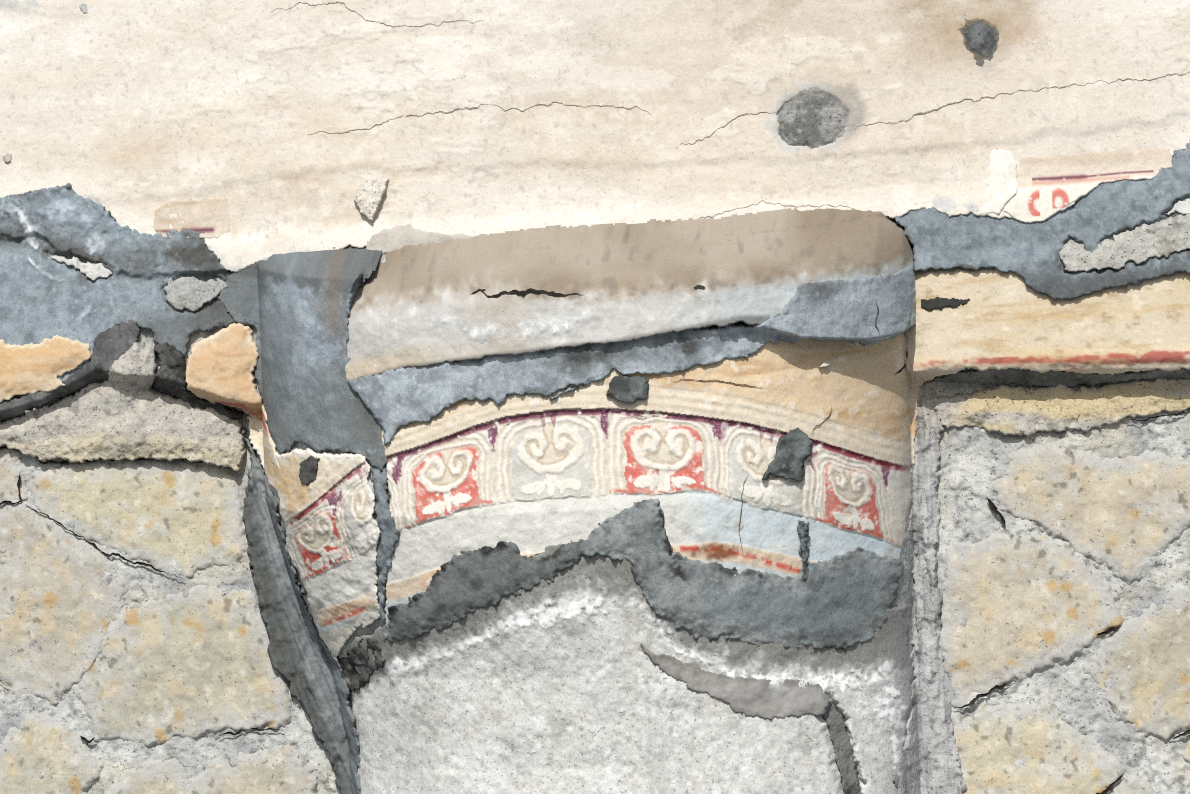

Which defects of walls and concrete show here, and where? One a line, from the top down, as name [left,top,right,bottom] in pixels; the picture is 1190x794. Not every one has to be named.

crack [313,102,649,134]
crack [856,71,1190,128]
peeling [980,149,1018,217]
flaking render [1059,198,1190,272]
flaking render [51,255,112,281]
flaking render [164,275,228,311]
spalling [340,638,385,691]